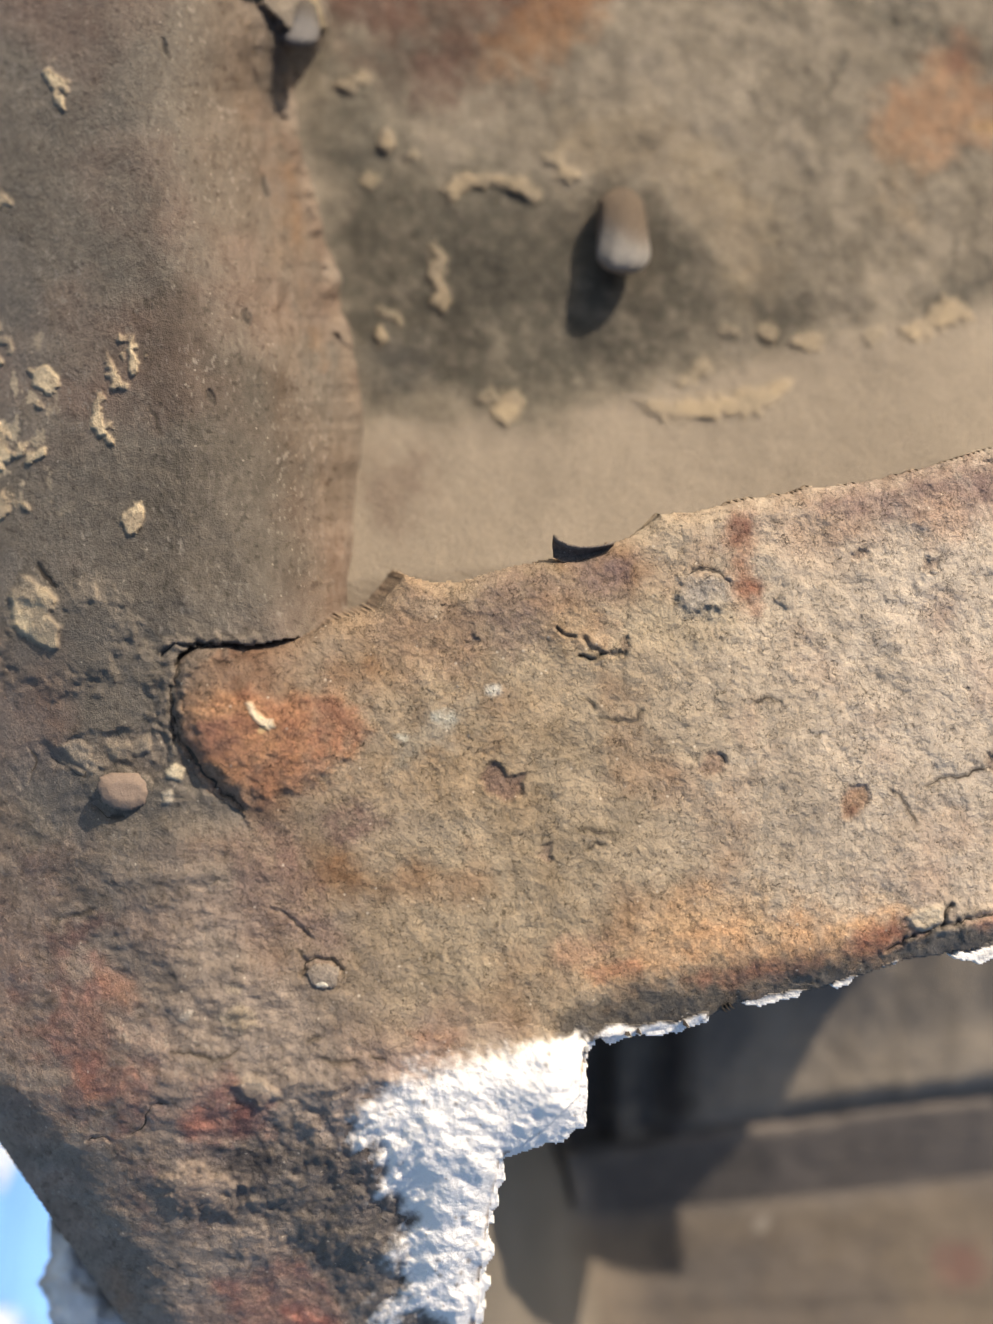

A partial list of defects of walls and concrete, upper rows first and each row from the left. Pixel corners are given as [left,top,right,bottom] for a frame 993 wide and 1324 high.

corrosion [326,0,622,125]
corrosion [861,48,993,247]
peeling [425,241,454,316]
leakage [297,27,831,448]
peeling [88,332,140,447]
peeling [120,501,145,536]
crack [163,642,243,807]
corrosion [546,871,931,1015]
crack [886,905,993,951]
corrosion [1,907,280,1155]
leakage [32,1125,160,1240]
leakage [157,1093,414,1324]